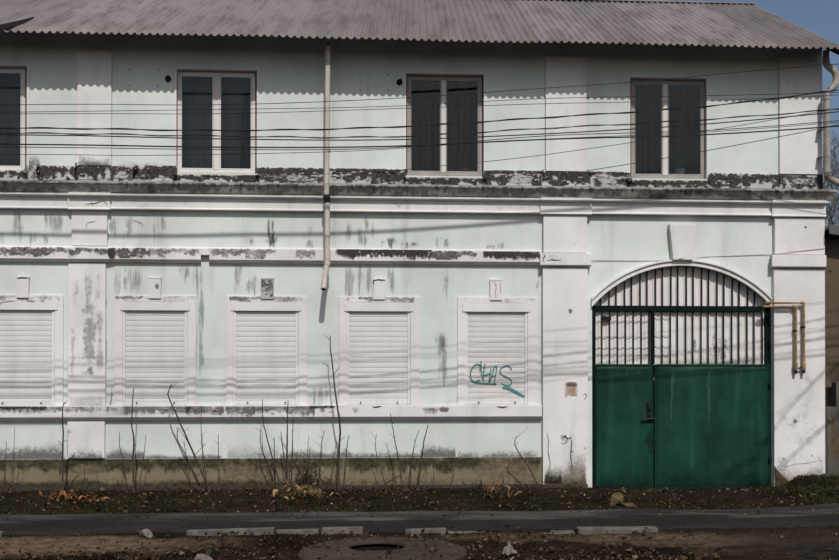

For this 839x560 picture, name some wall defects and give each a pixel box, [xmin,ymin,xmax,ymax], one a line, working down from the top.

peeling [0,165,243,182]
peeling [255,168,824,189]
water stain [212,223,275,259]
spalling [565,382,577,396]
crack [547,434,585,473]
water stain [0,448,540,487]
water stain [544,465,586,484]